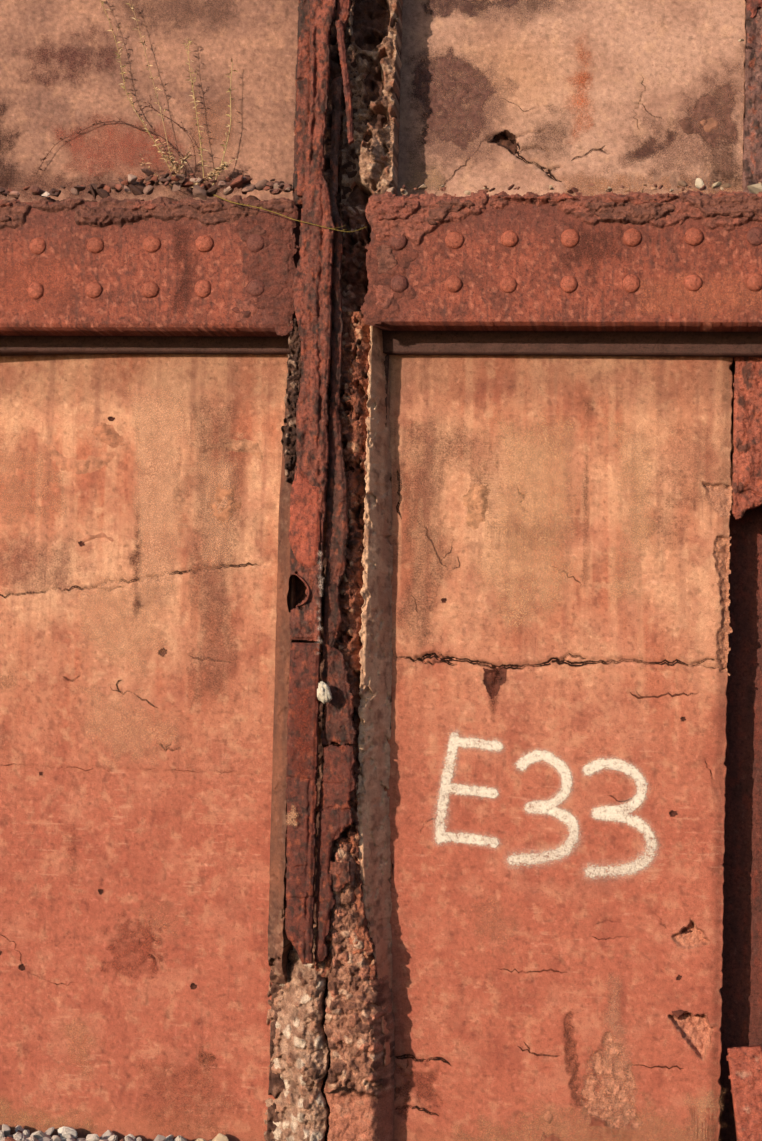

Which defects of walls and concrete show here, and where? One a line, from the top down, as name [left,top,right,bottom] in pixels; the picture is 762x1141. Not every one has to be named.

water stain [406,51,513,191]
crack [438,101,606,190]
corrosion [0,195,299,336]
corrosion [360,190,762,326]
crack [0,562,257,598]
spalling [264,0,517,1141]
crack [399,653,724,699]
spalling [671,918,710,950]
spalling [564,1013,641,1129]
spalling [668,1010,713,1061]